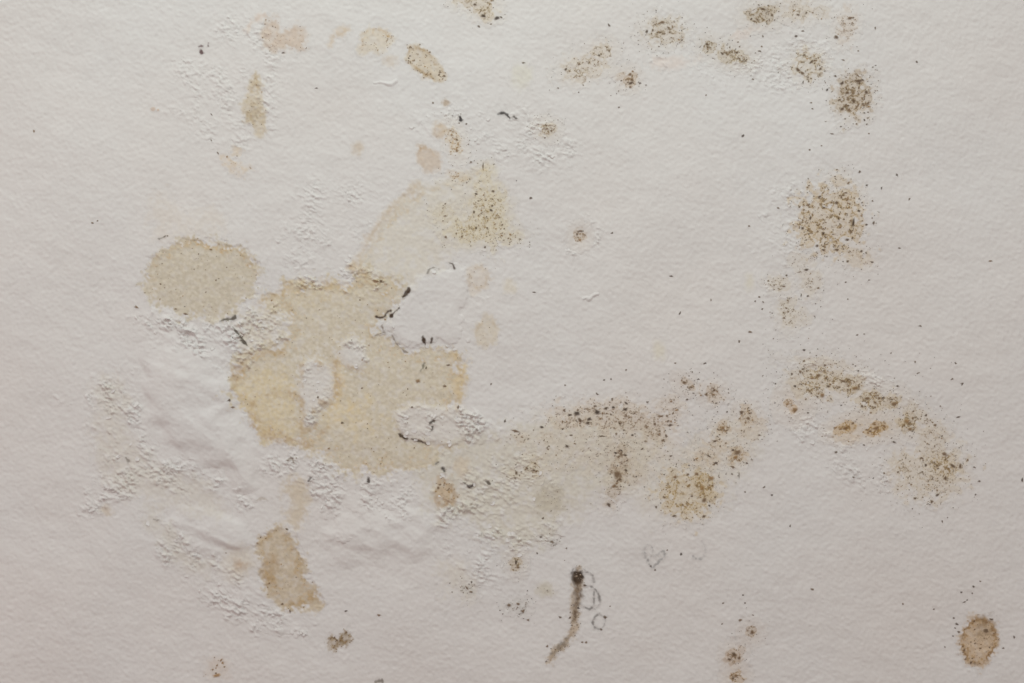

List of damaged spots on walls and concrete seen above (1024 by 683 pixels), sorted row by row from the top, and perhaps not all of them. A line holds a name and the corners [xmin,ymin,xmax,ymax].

damp [325,22,449,84]
damp [506,0,886,134]
damp [346,97,539,298]
damp [230,287,302,367]
damp [407,164,986,668]
damp [944,580,1015,676]